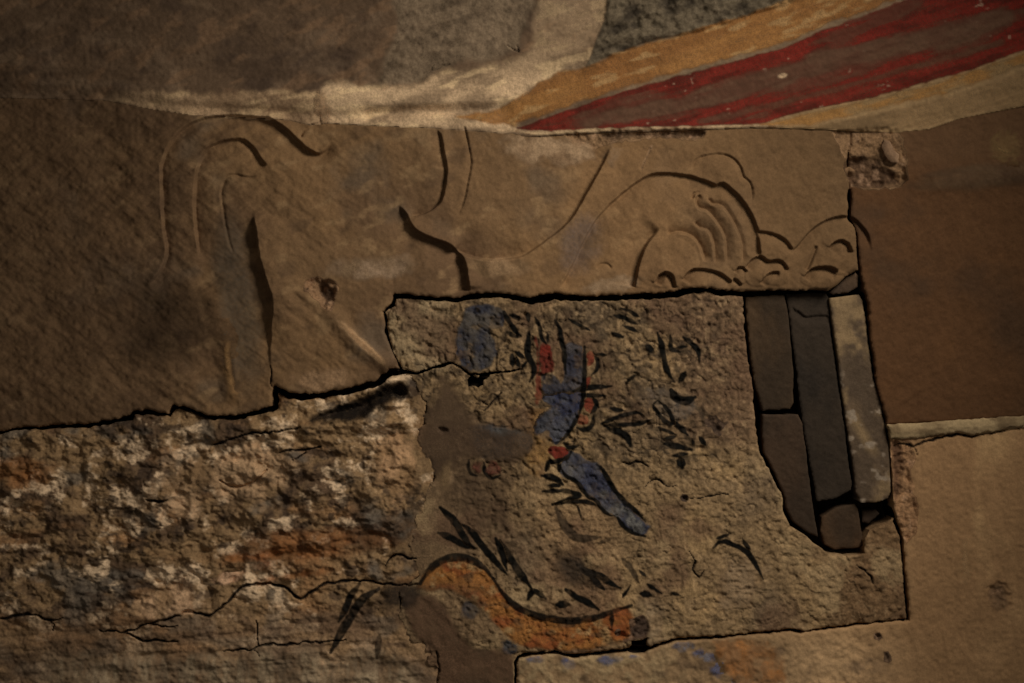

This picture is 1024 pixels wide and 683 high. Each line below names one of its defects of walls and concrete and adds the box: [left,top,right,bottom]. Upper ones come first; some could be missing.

spalling [832,130,908,190]
crack [0,288,825,460]
crack [0,612,61,627]
crack [100,554,417,642]
crack [225,620,346,654]